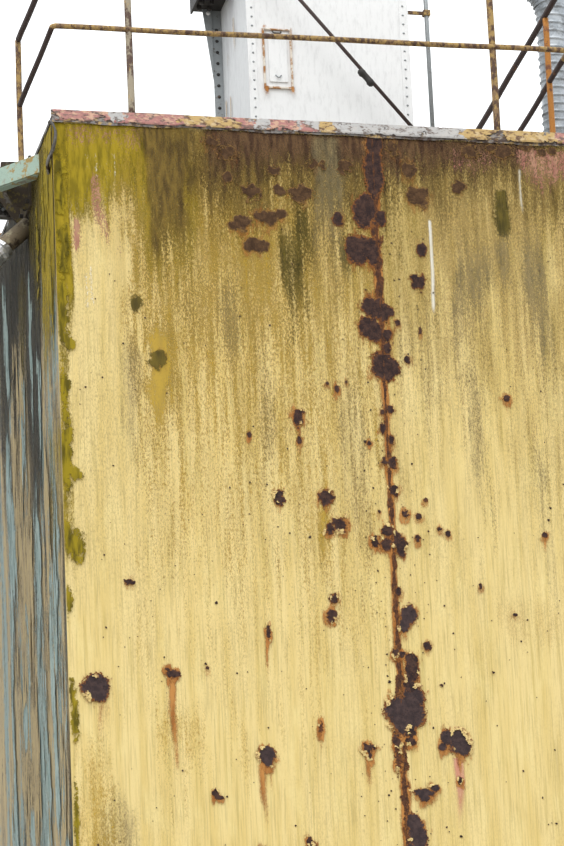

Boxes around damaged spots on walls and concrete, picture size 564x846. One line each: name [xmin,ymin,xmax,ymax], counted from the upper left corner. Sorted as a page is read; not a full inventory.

rust [266,164,318,205]
peeling [52,109,564,193]
leakage [136,127,564,379]
rust [79,672,112,720]
rust [161,656,184,771]